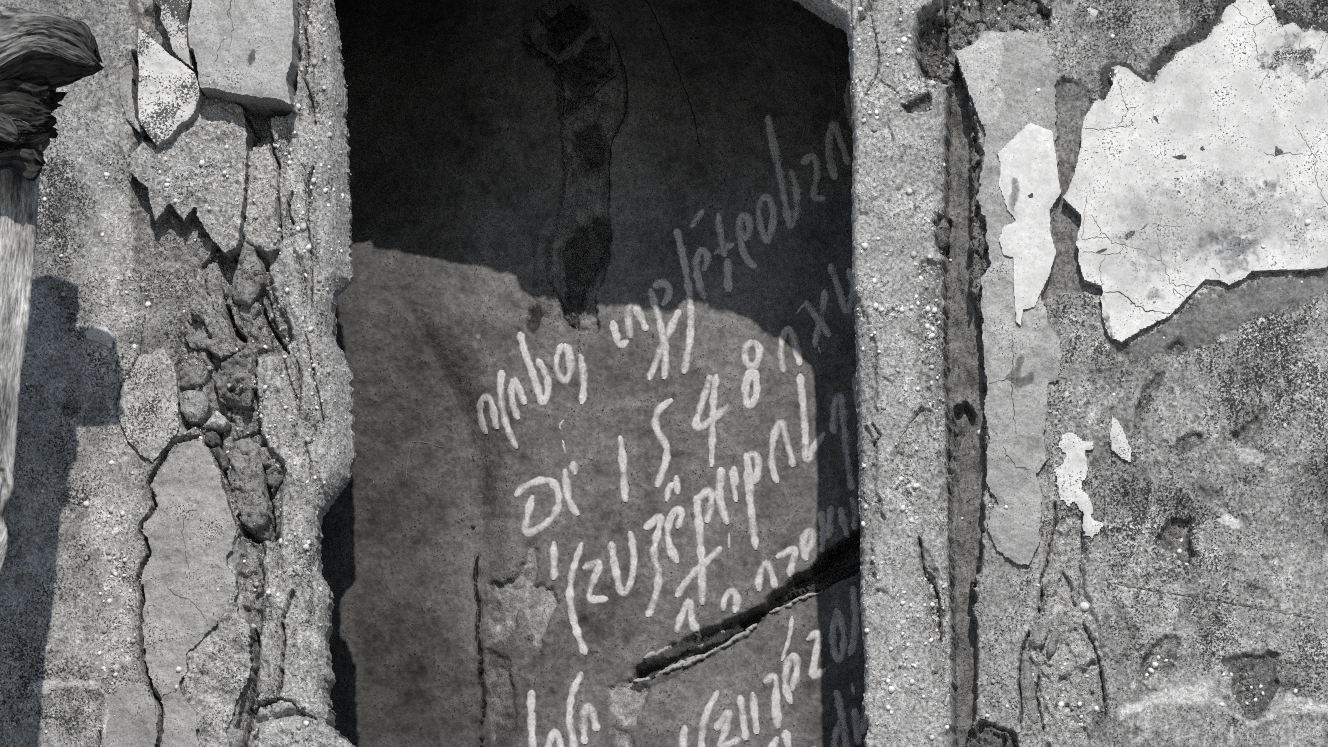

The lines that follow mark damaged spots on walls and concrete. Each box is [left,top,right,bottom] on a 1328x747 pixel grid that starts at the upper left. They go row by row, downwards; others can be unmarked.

peeling [119,0,300,263]
crack [225,113,324,421]
crack [303,0,316,122]
peeling [902,0,1328,566]
crack [115,315,313,747]
crack [1018,501,1320,731]